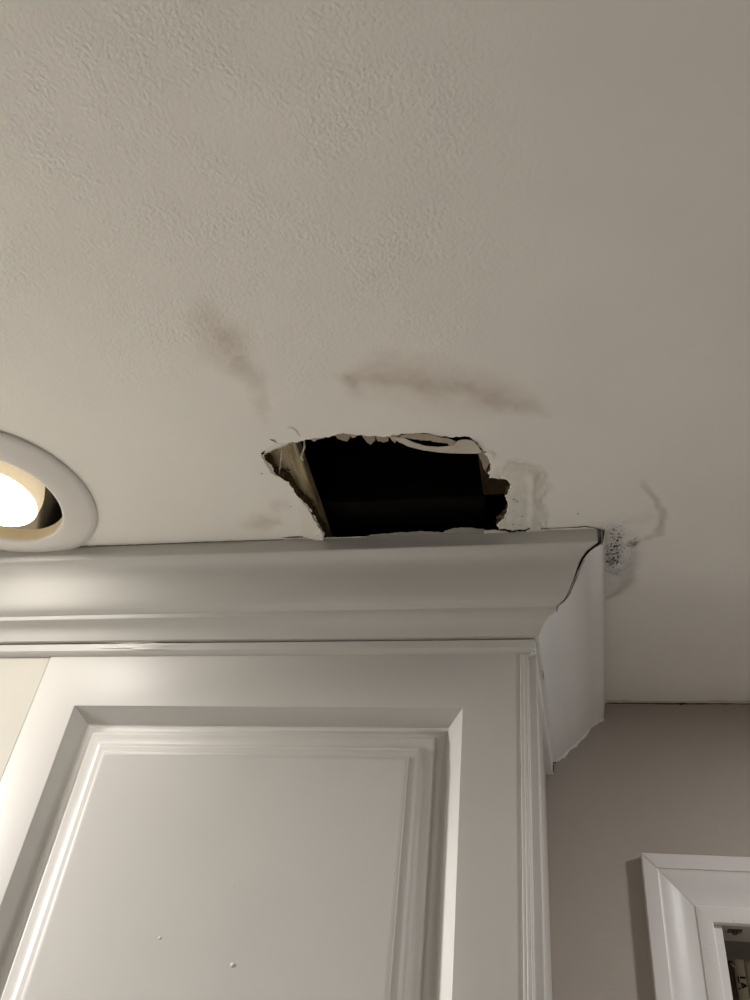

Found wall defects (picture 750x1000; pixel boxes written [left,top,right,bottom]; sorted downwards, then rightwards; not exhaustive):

peeling [311,433,456,446]
peeling [479,450,489,473]
damp [605,527,637,575]